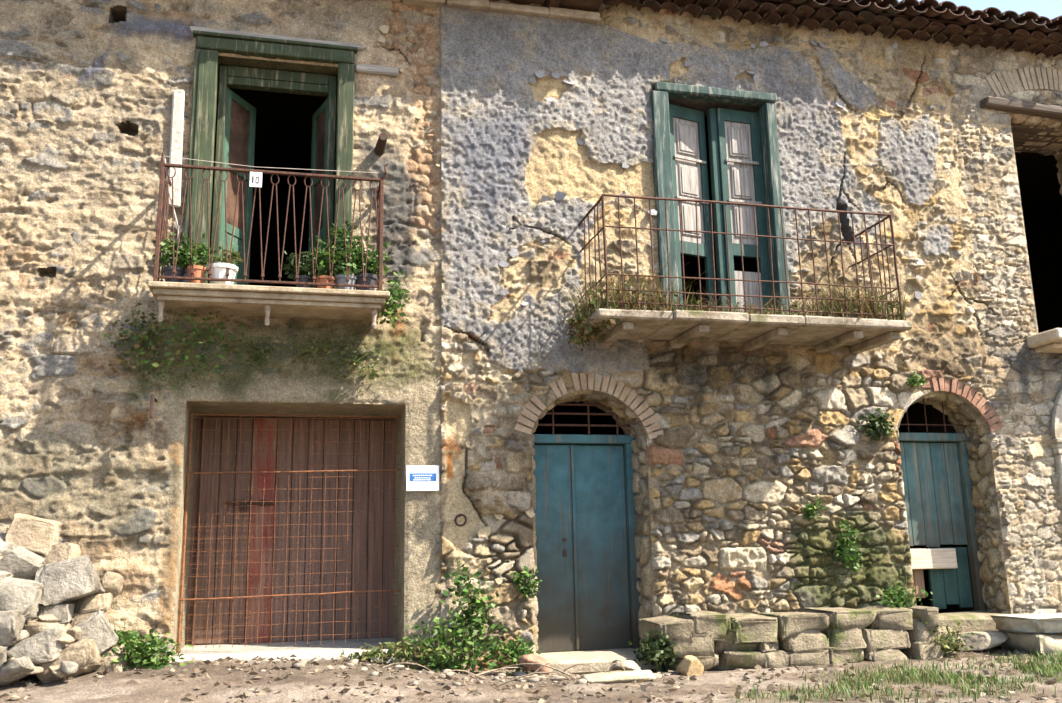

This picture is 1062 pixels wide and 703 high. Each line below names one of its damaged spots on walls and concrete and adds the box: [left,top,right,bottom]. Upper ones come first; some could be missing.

peeling [529,70,576,102]
peeling [525,127,657,216]
peeling [600,15,930,319]
crack [836,155,860,210]